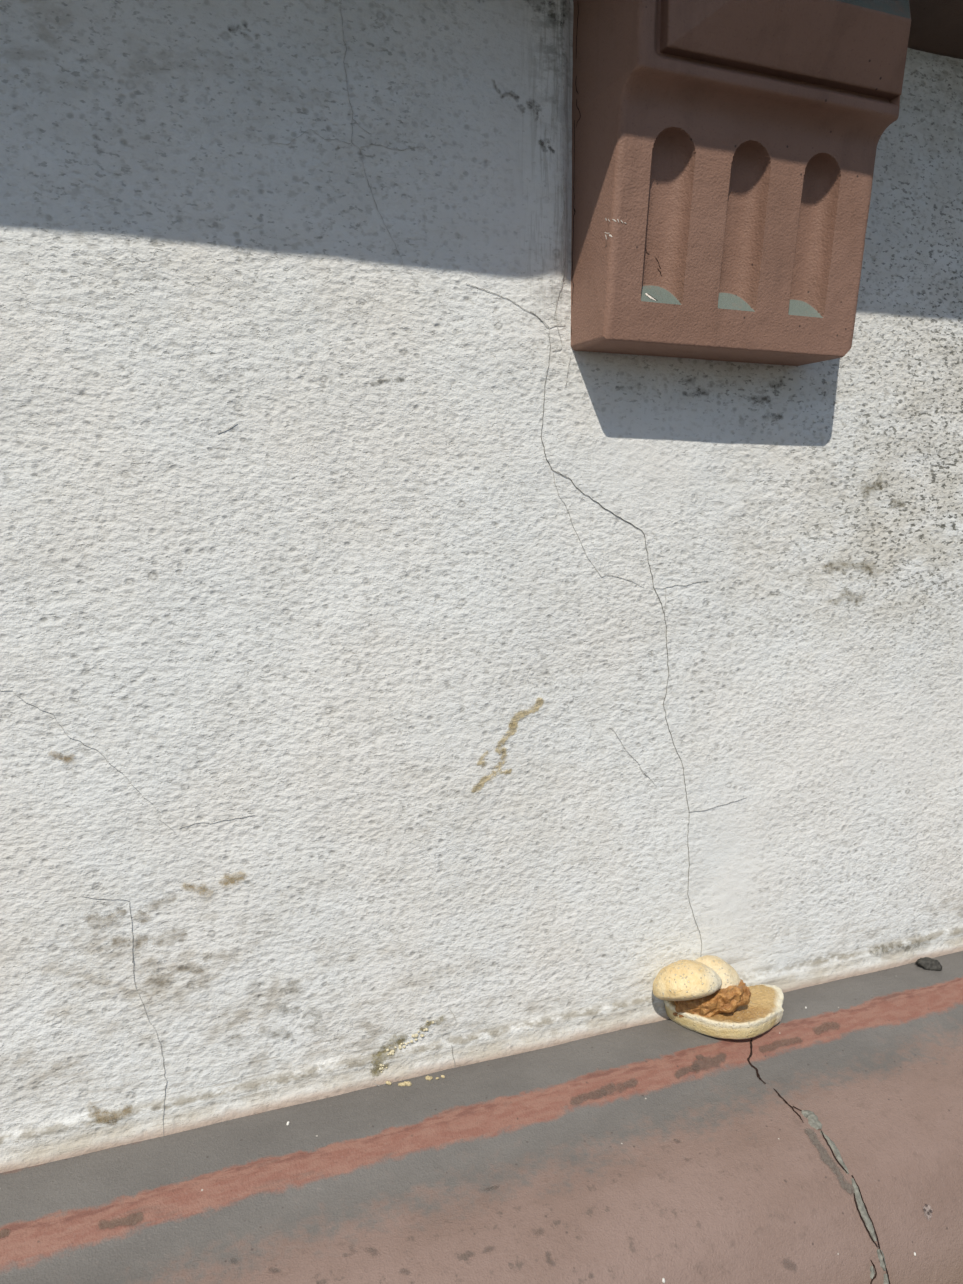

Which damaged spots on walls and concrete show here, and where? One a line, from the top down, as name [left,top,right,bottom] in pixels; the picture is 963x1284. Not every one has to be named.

crack [269,2,426,267]
crack [466,7,746,951]
leakage [371,1017,443,1076]
crack [747,1038,890,1284]